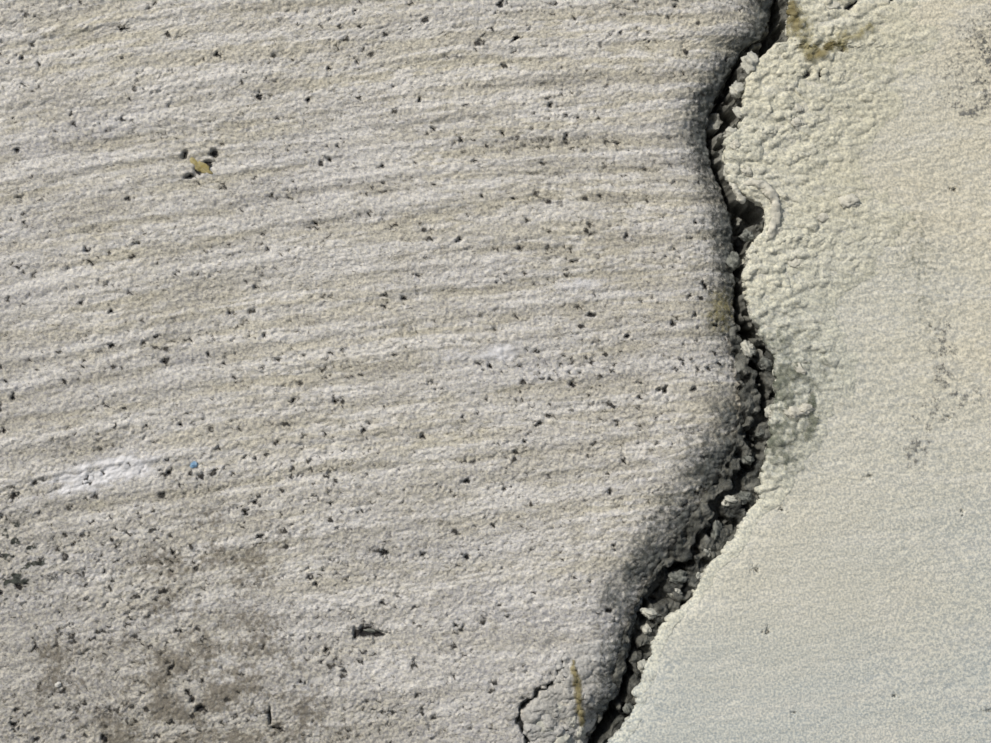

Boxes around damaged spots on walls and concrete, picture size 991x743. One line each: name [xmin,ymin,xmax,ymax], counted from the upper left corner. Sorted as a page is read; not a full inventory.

crack [516,661,563,743]
crack [573,0,788,743]